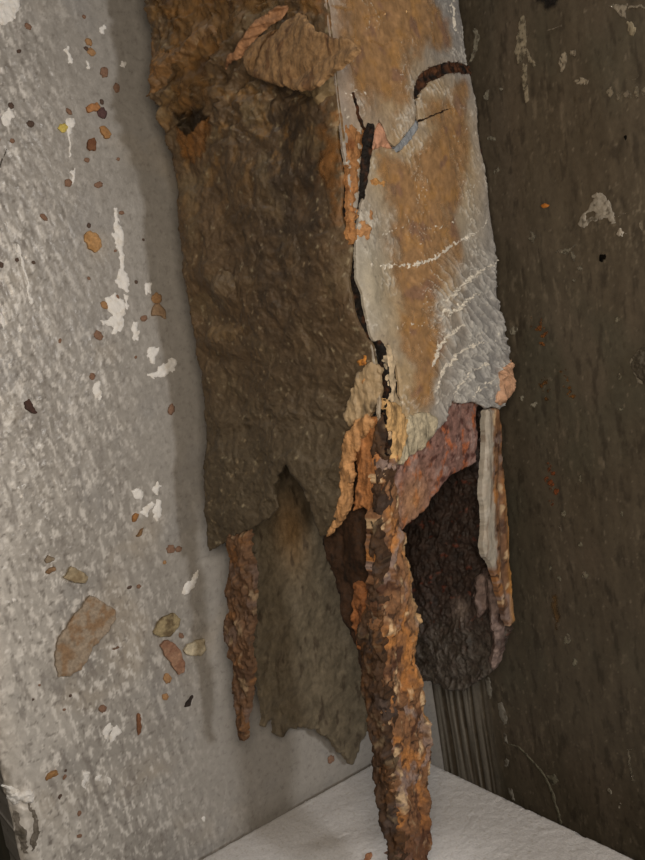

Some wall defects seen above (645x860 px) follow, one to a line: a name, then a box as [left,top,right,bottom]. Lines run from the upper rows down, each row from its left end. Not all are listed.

rust [176,117,210,162]
crack [338,92,392,223]
crack [414,61,472,122]
rust [382,86,467,399]
crack [350,244,400,456]
peeling [495,360,537,407]